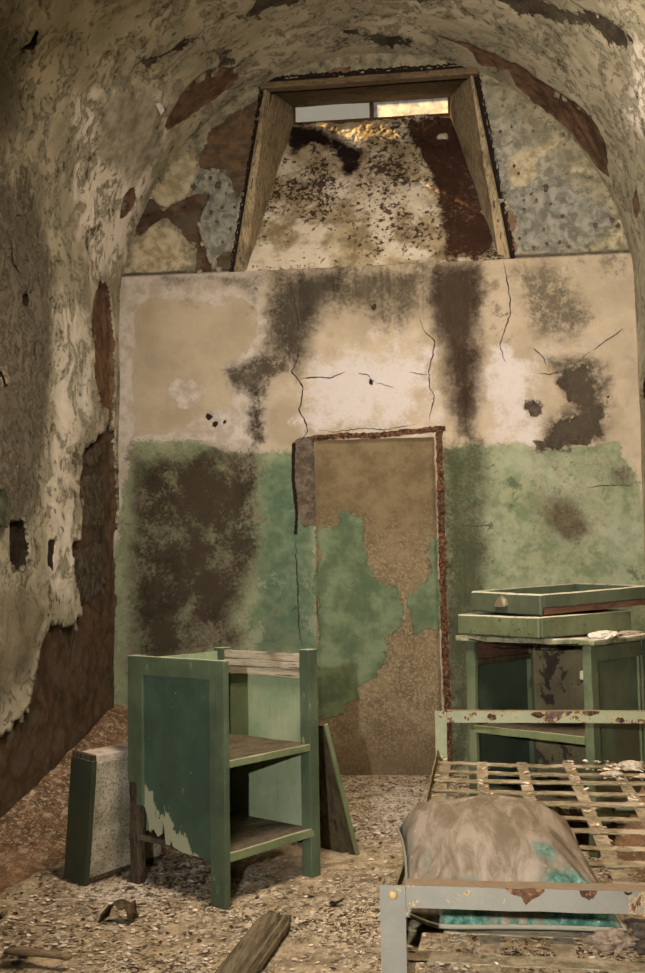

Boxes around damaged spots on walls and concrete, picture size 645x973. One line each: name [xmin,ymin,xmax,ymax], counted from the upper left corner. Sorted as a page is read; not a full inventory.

flaking render [155,49,242,130]
flaking render [438,35,609,177]
flaking render [120,101,261,274]
crack [291,292,435,444]
crack [496,262,511,362]
crack [533,329,622,375]
water stain [547,359,608,444]
flaking render [0,277,119,819]
mould [132,451,256,657]
water stain [226,265,485,710]
peeling [312,510,442,720]
water stain [452,723,468,769]